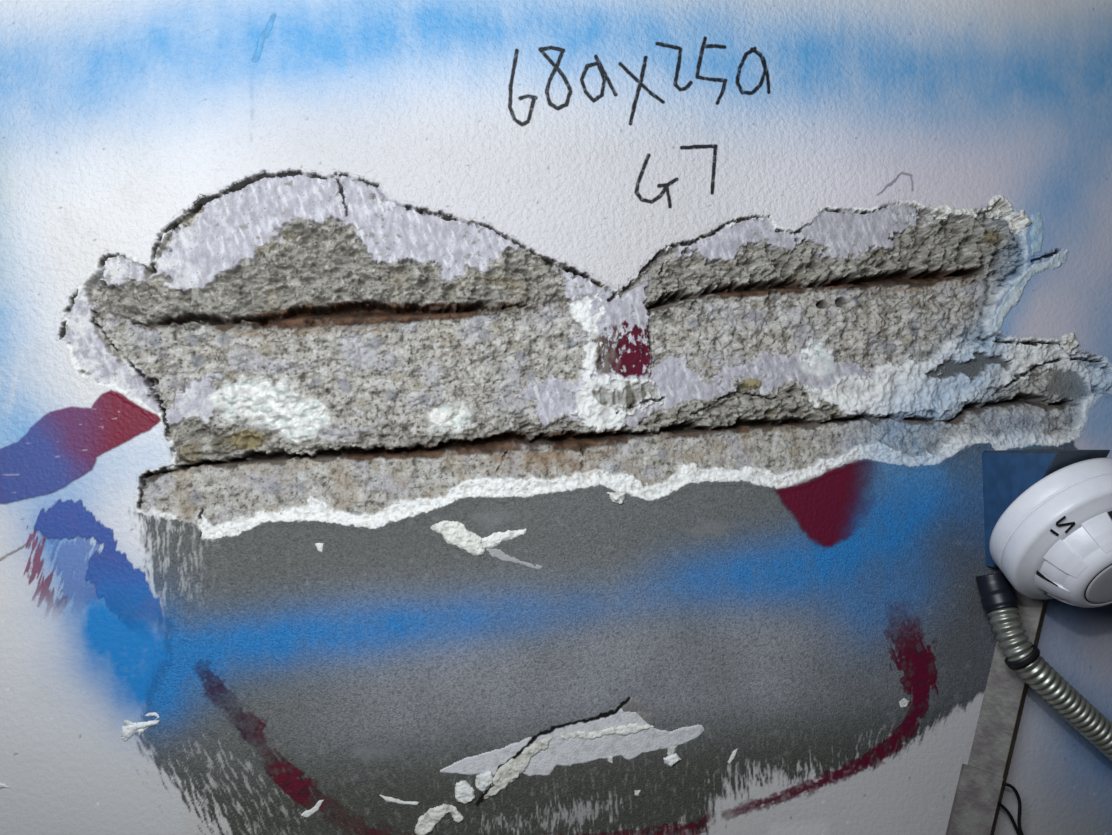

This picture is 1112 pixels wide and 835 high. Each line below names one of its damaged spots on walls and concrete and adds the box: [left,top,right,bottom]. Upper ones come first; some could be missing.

spalling [55,167,1112,571]
peeling [380,697,705,835]